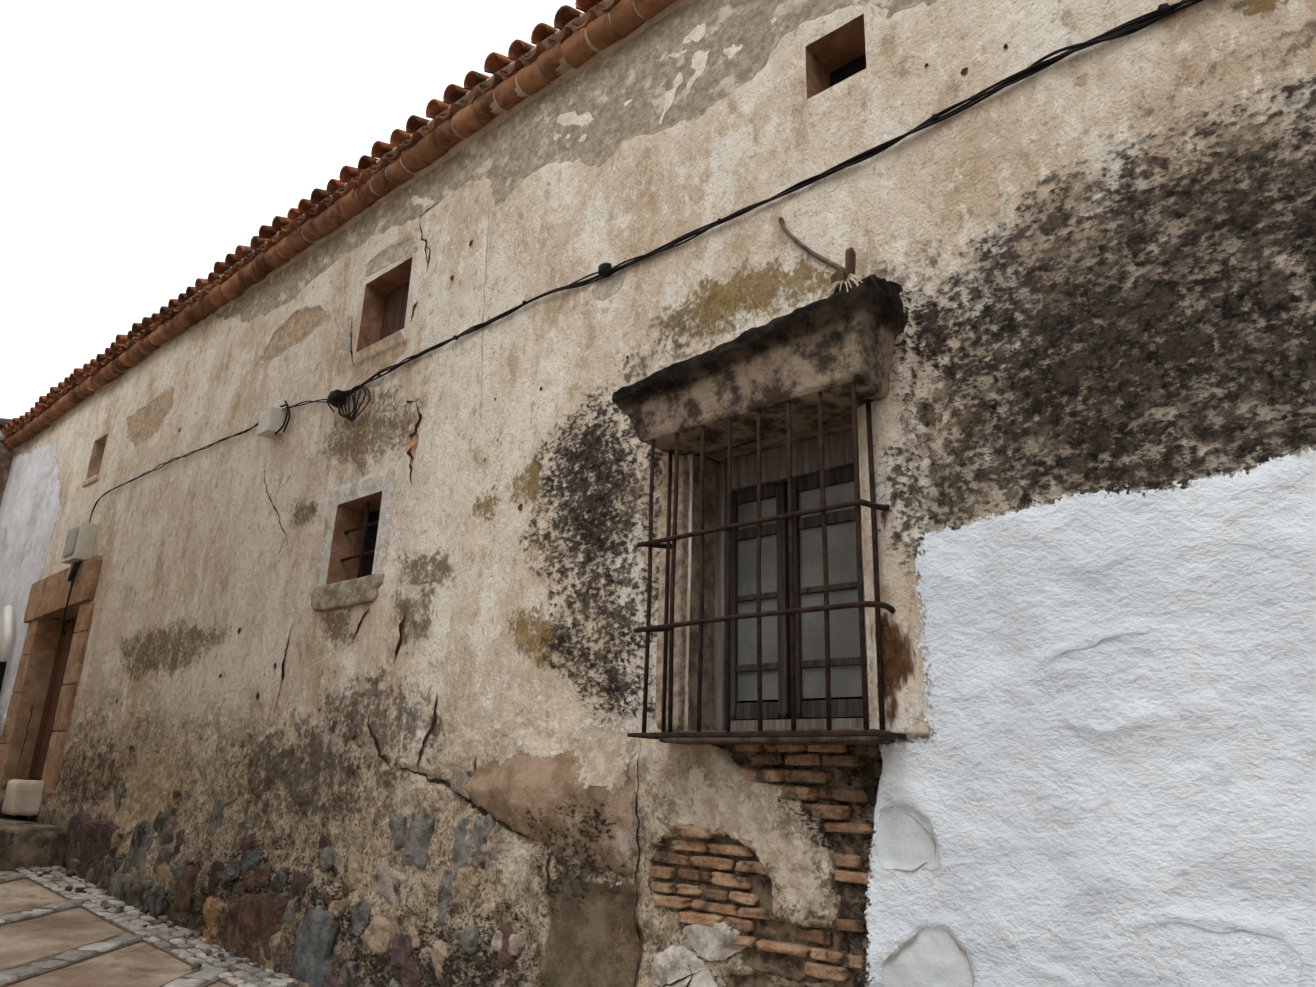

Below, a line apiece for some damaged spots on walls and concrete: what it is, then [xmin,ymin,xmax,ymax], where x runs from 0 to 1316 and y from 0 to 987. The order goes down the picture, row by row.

water stain [1248,20,1316,72]
water stain [863,74,1316,570]
water stain [520,283,747,726]
rust [871,612,916,725]
water stain [164,663,643,987]
crack [367,690,553,895]
flaking render [648,745,973,987]